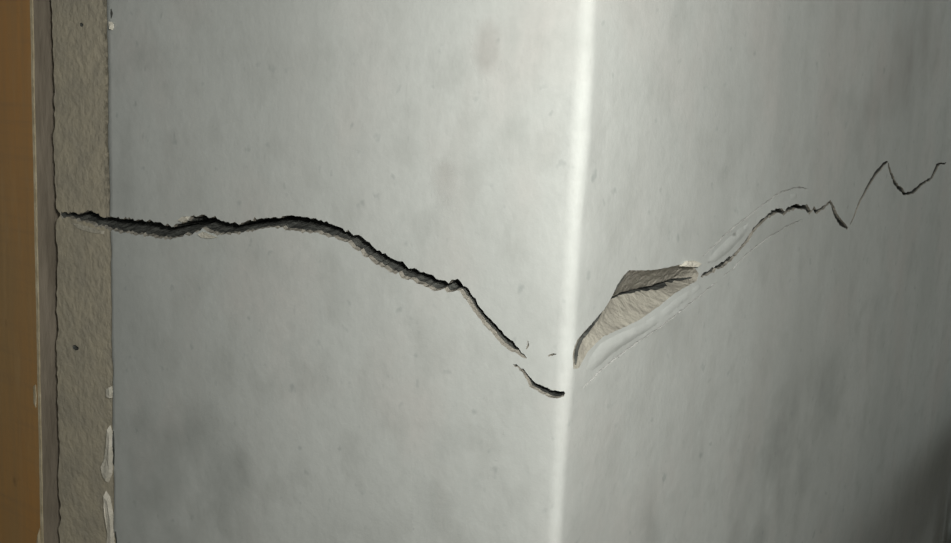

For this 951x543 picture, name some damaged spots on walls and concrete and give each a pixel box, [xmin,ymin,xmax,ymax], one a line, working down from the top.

crack [701,161,946,277]
crack [60,210,565,398]
spalling [573,261,701,369]